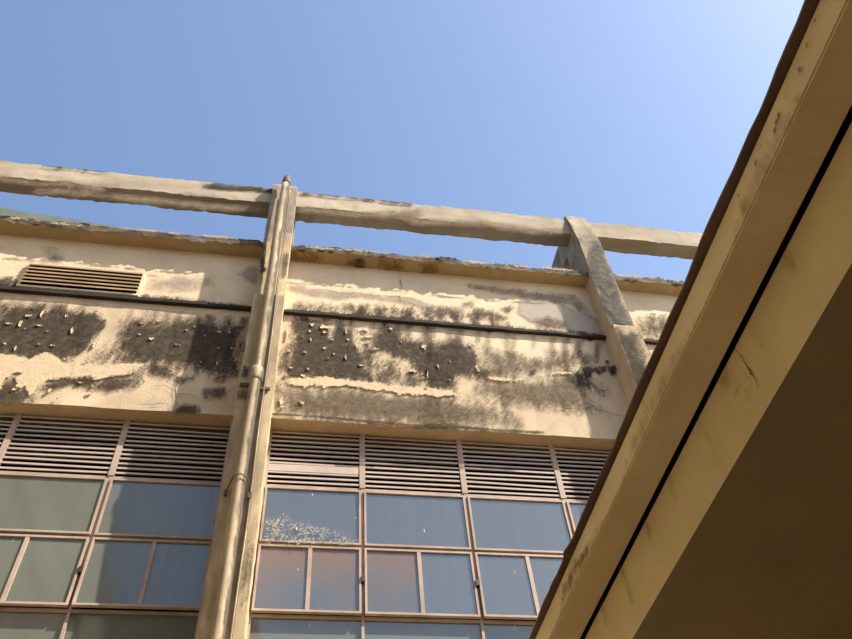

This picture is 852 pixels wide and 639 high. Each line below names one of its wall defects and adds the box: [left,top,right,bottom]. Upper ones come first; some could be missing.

damp [0,176,272,212]
damp [0,276,36,289]
damp [588,239,665,383]
damp [0,299,246,399]
damp [275,301,617,429]
damp [0,374,35,405]
crack [139,372,221,406]
damp [171,404,201,414]